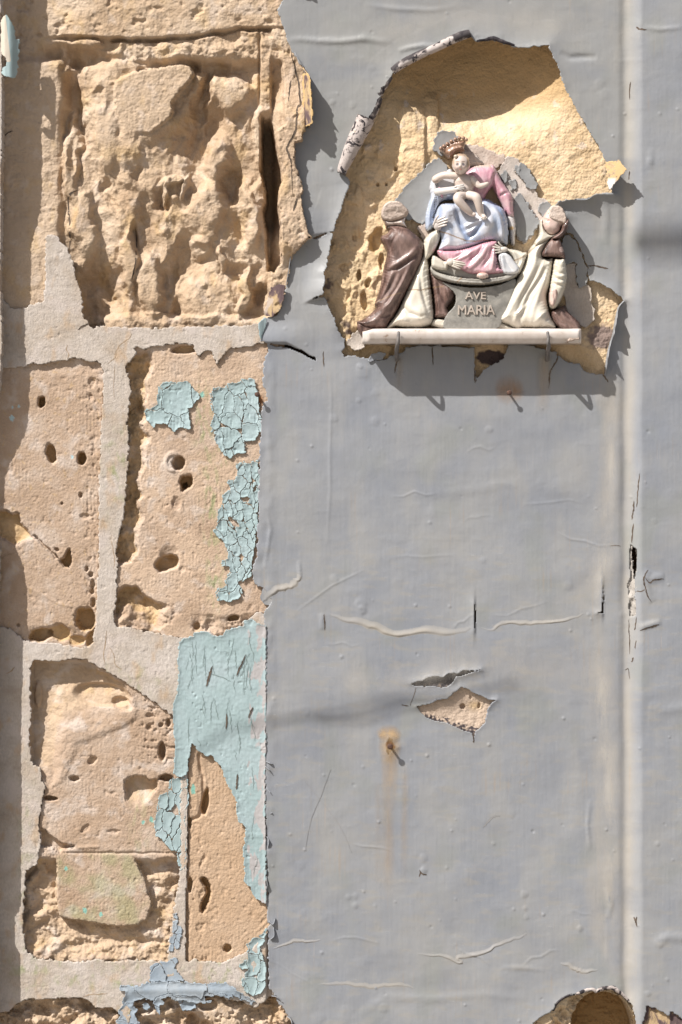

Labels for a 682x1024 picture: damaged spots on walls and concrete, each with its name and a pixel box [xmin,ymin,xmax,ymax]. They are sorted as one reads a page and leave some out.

peeling [319,30,627,381]
spalling [0,0,325,1024]
crack [598,475,662,678]
peeling [417,687,495,736]
spalling [533,986,682,1024]